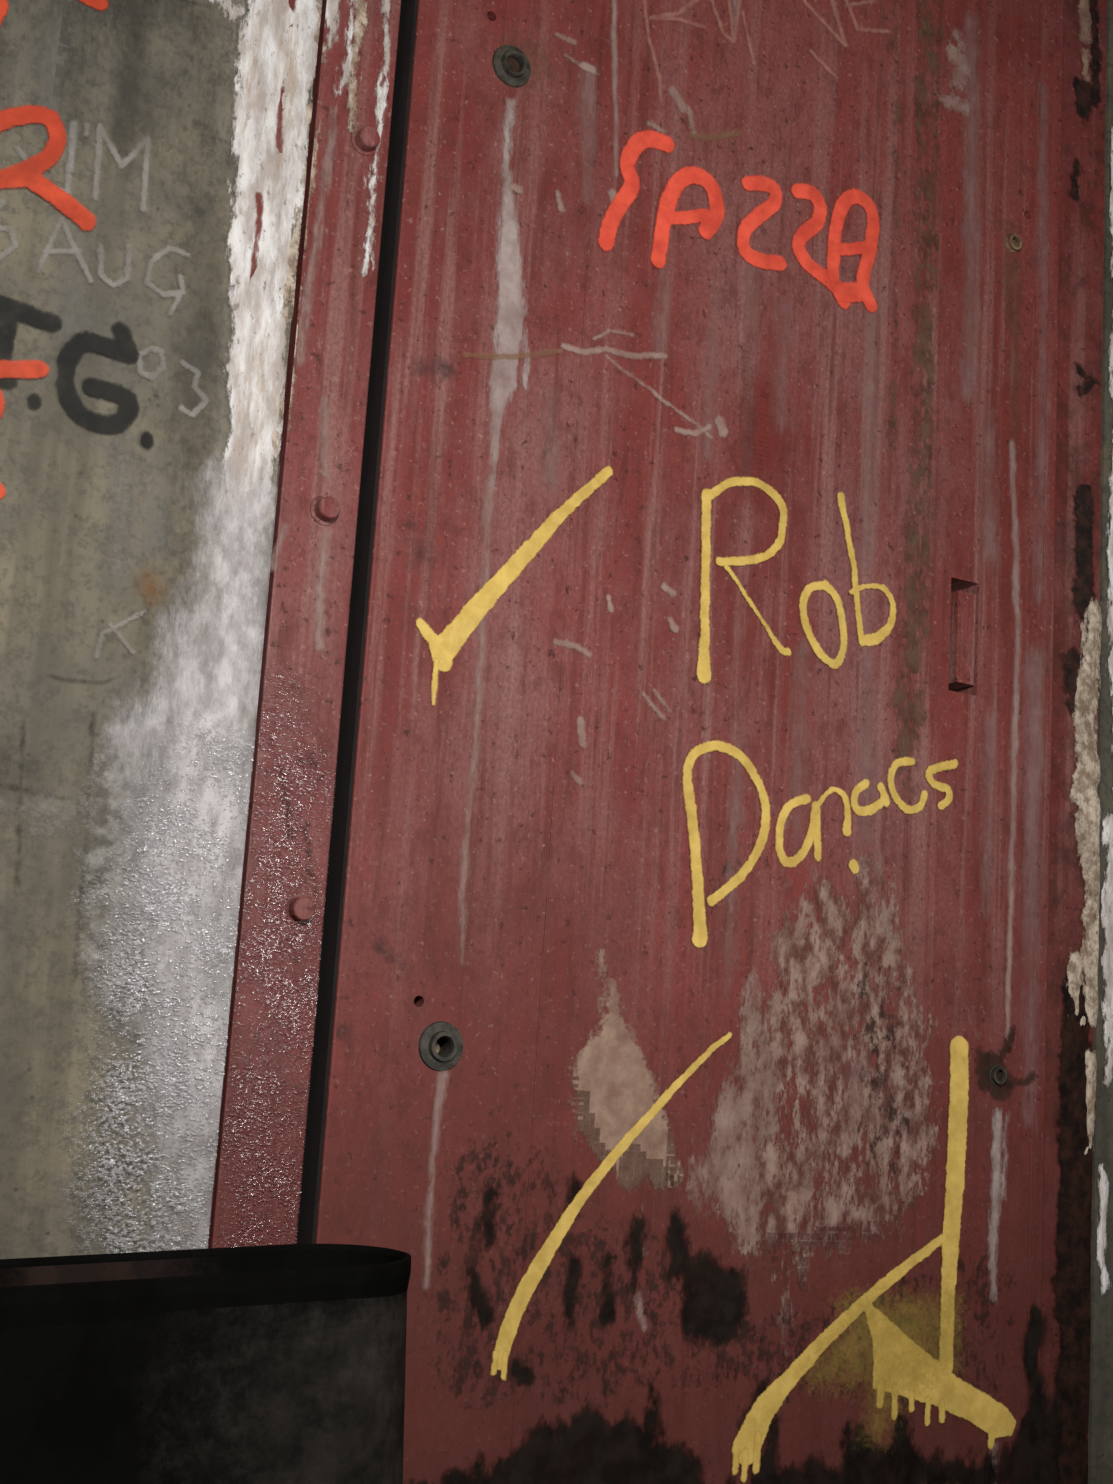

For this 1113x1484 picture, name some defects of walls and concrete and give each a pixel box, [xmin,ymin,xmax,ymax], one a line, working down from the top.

rust [1073,0,1103,121]
rust [890,0,943,797]
rust [1076,363,1100,398]
leakage [82,0,324,1254]
leakage [315,534,328,649]
rust [1060,647,1084,715]
rust [1072,484,1096,620]
peeling [567,851,940,1288]
rust [976,1028,1037,1100]
spalling [437,1133,874,1407]
spalling [875,1256,1013,1389]
rust [1051,971,1093,1484]